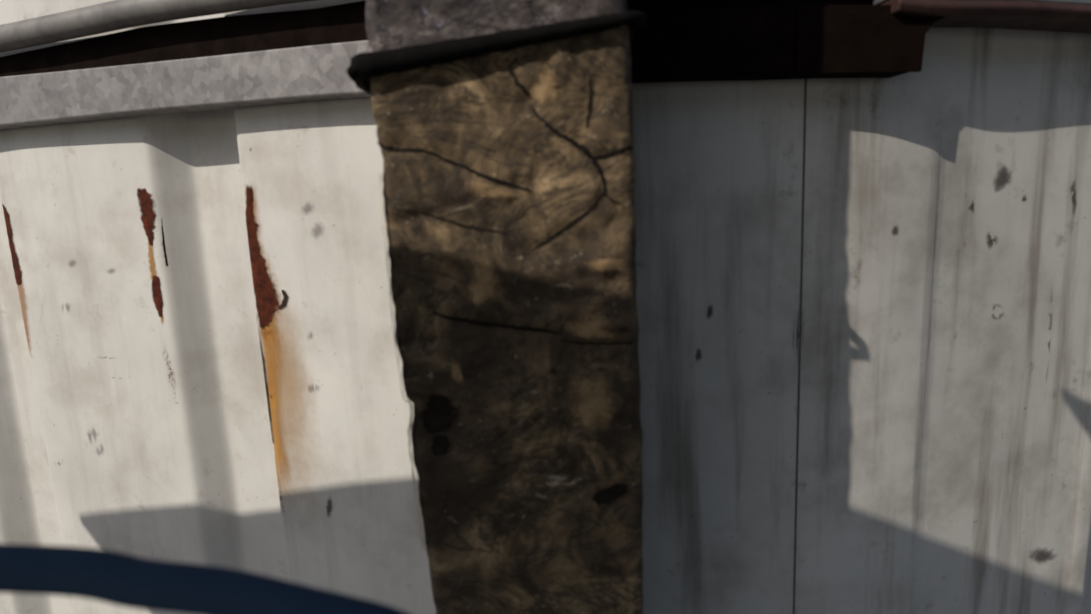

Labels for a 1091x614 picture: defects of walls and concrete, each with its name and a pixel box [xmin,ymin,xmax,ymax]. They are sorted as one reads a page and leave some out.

corrosion [2,204,29,343]
corrosion [137,188,163,322]
corrosion [245,186,288,475]